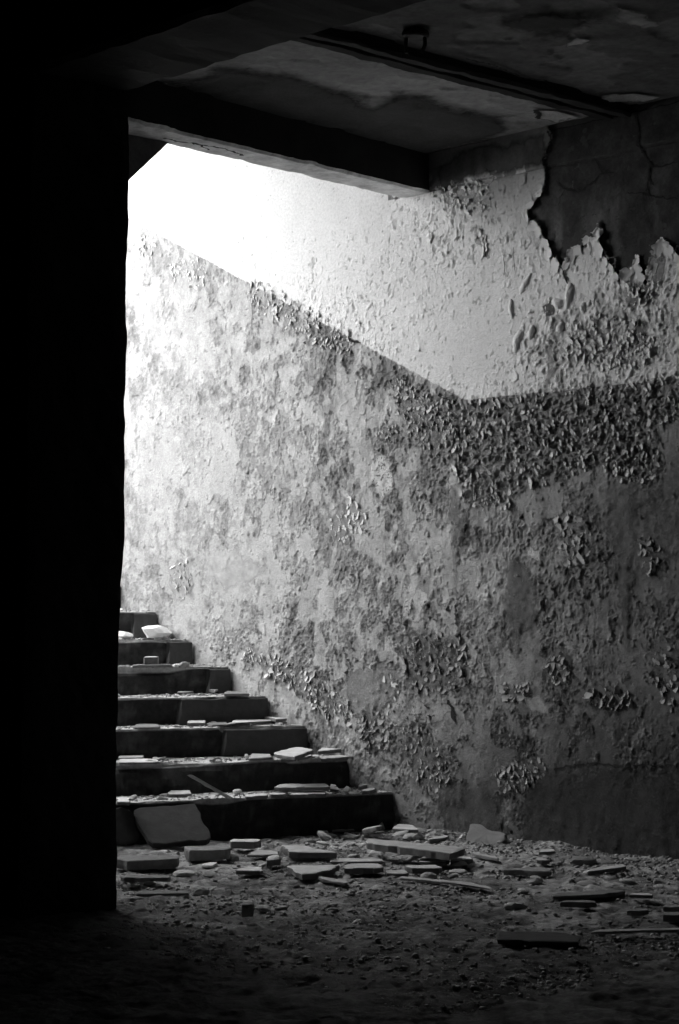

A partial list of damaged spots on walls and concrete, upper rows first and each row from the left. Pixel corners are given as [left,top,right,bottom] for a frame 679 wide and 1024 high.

flaking render [371,93,679,511]
peeling [330,495,366,543]
peeling [543,648,571,686]
flaking render [242,588,469,799]
peeling [582,685,636,711]
peeling [495,757,546,794]